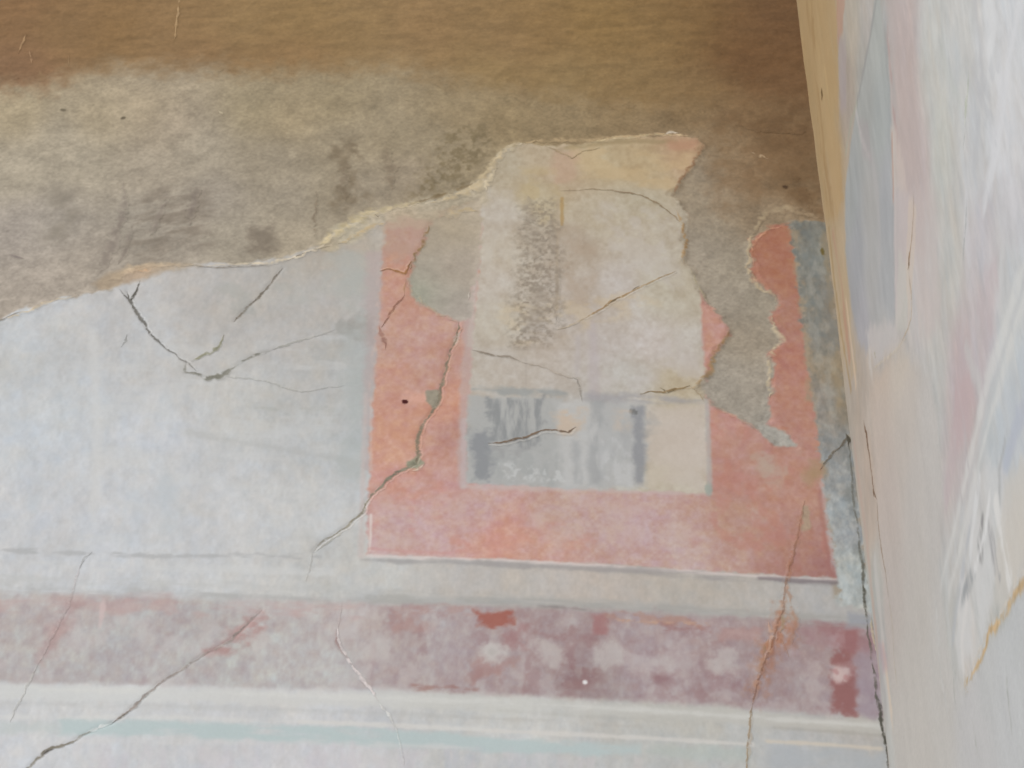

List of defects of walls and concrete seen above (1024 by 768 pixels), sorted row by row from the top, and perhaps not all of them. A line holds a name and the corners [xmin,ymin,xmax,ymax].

crack [120,268,345,392]
crack [378,261,411,348]
flaking render [0,75,825,450]
crack [306,322,582,580]
crack [642,385,704,401]
crack [10,552,92,721]
crack [25,610,262,768]
crack [745,500,805,768]
crack [820,420,897,768]